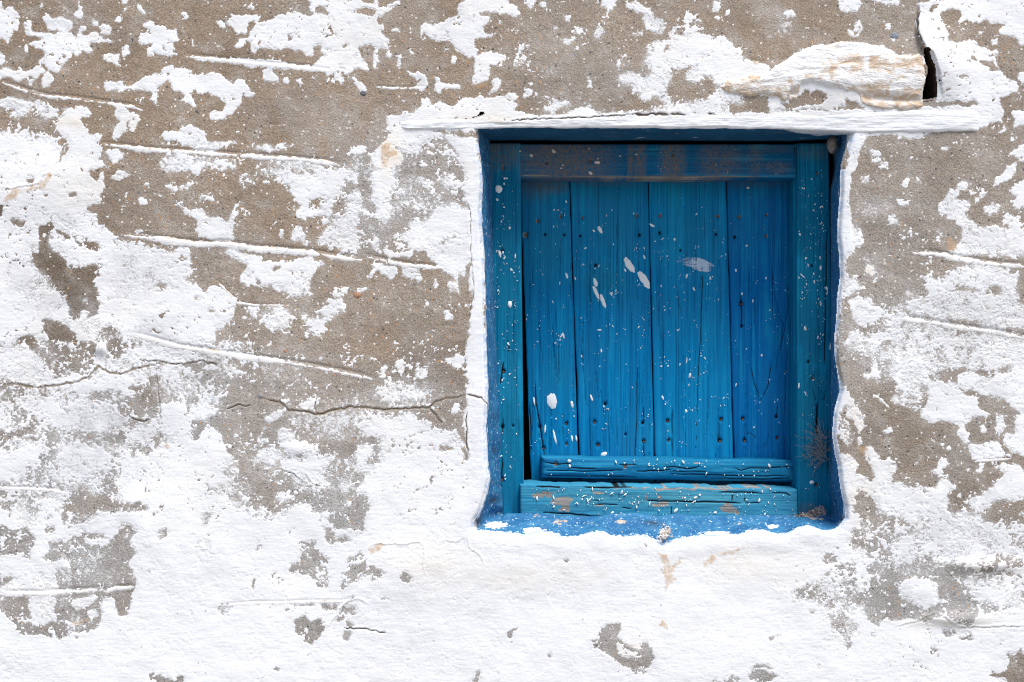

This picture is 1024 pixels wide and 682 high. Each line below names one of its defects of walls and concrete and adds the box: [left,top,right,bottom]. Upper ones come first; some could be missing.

peeling [0,0,980,560]
peeling [790,6,1024,650]
crack [4,359,217,422]
crack [227,394,487,451]
peeling [0,523,142,641]
peeling [399,570,413,584]
peeling [591,622,655,675]